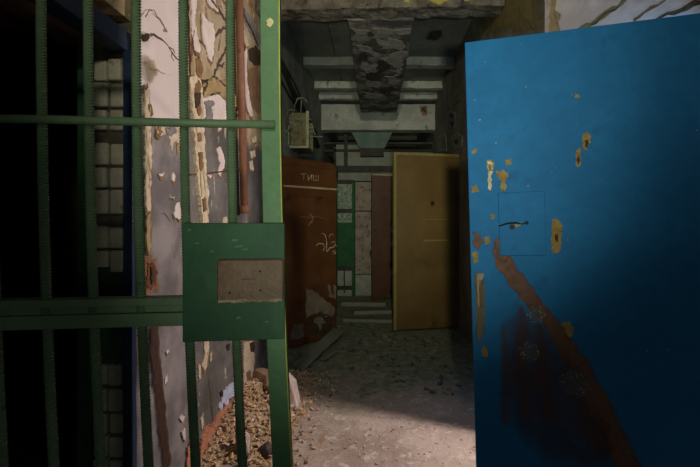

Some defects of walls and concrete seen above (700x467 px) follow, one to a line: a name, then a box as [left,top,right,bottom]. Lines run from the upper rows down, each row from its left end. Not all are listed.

crack [579,0,627,28]
crack [633,0,700,21]
crack [145,0,193,76]
spalling [188,0,505,223]
peeling [142,83,181,256]
spalling [486,159,512,192]
rust [473,232,483,250]
spalling [551,219,563,253]
rust [144,255,159,296]
spalling [242,340,255,385]
rust [492,238,642,467]
spalling [200,381,235,459]